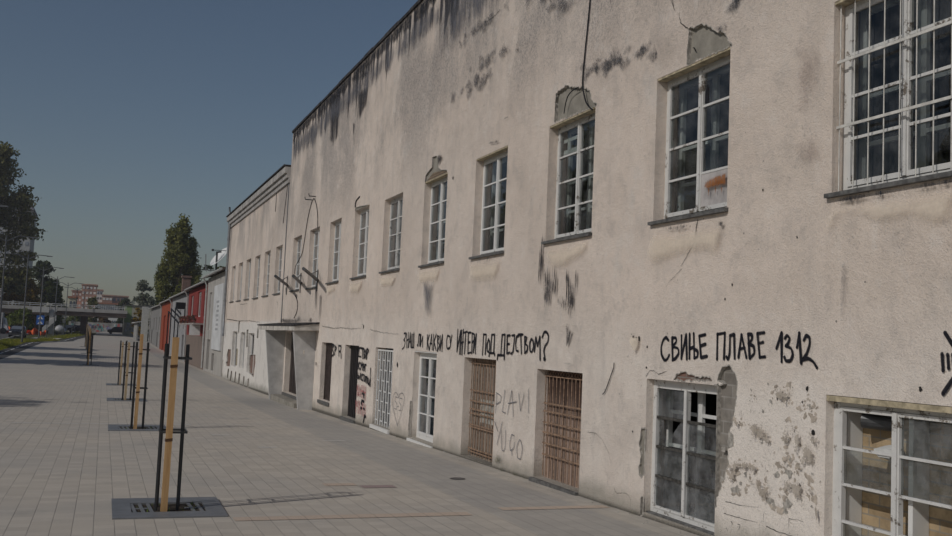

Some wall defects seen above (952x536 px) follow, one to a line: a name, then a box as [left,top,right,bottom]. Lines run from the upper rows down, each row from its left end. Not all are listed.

leakage [293,0,484,156]
flaking render [554,85,597,122]
flaking render [687,23,733,66]
leakage [538,238,583,314]
flaking render [673,364,821,521]